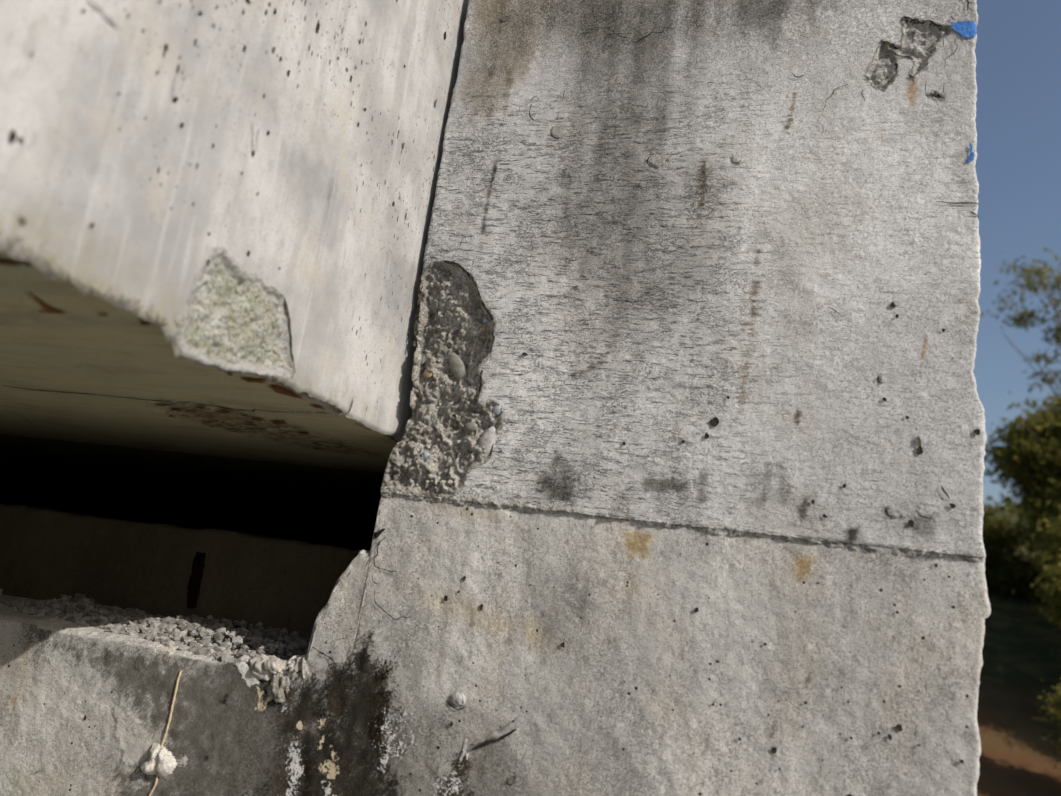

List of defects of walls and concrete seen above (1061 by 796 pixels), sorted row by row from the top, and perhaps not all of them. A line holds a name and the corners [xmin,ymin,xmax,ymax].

spalling [864,16,953,93]
spalling [927,89,947,101]
spalling [0,221,505,500]
crack [371,528,411,620]
damp [20,624,422,796]
damp [423,751,475,796]